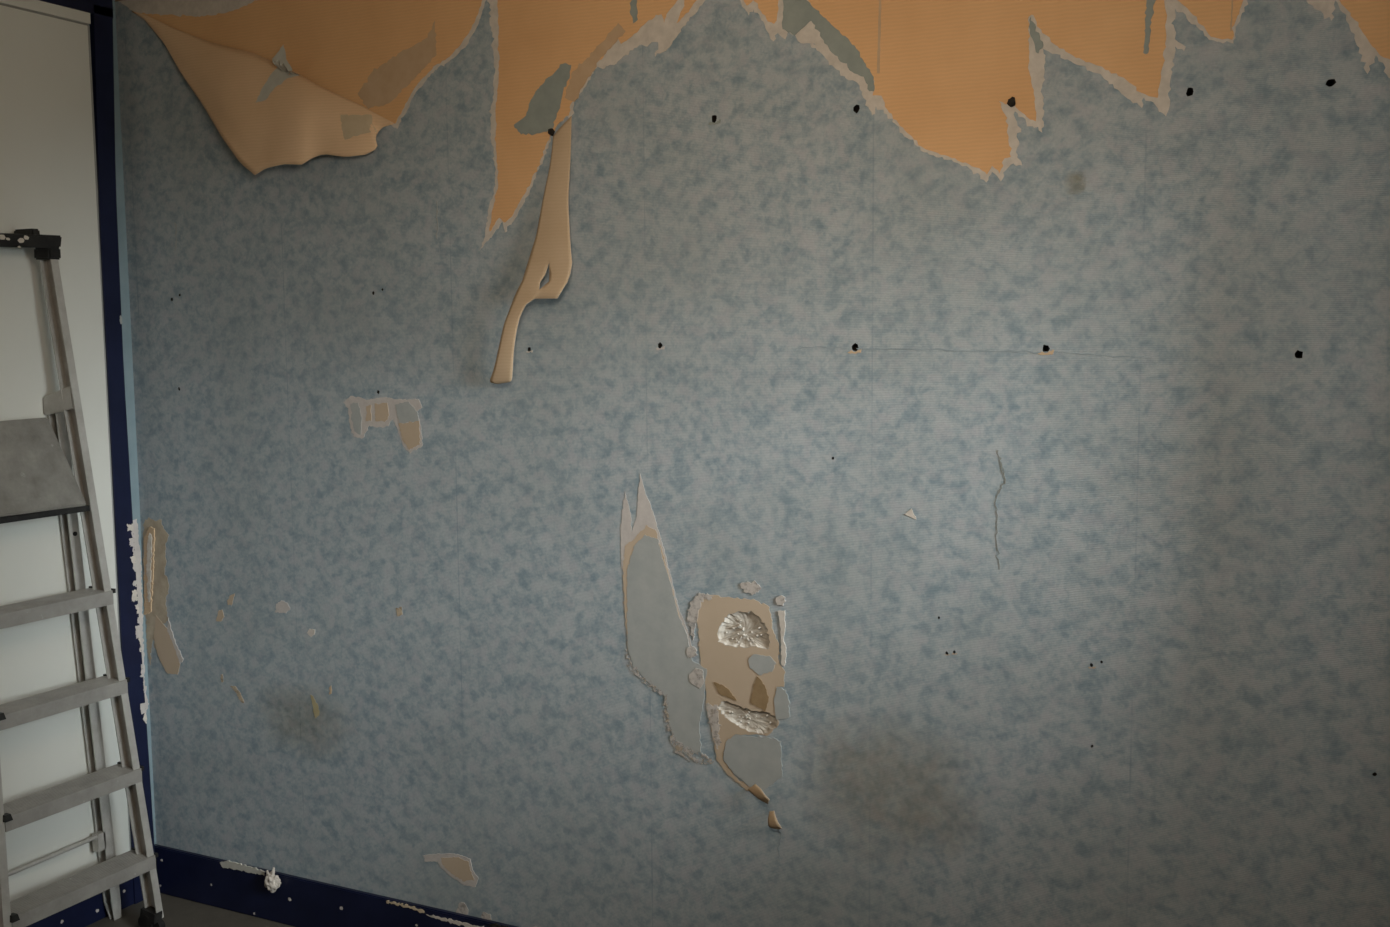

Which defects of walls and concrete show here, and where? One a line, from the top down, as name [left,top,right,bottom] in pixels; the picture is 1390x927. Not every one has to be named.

peeling [343,396,423,453]
crack [994,450,1006,569]
peeling [620,475,790,791]
flaking render [220,860,266,875]
peeling [386,853,508,927]